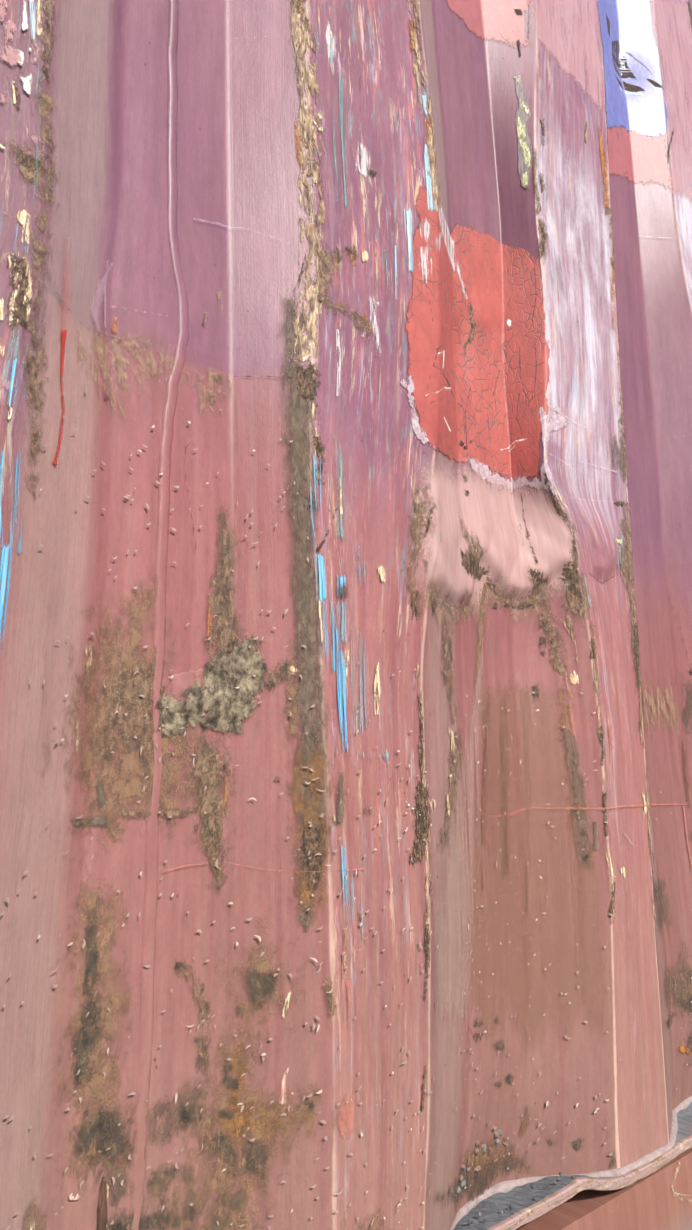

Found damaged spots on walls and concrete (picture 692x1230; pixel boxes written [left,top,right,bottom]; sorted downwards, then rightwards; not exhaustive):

peeling [514,0,531,56]
corrosion [23,0,59,496]
corrosion [290,0,372,362]
peeling [400,374,436,449]
peeling [420,219,442,280]
crack [426,206,545,461]
peeling [460,406,569,500]
corrosion [69,588,231,890]
corrosion [407,473,625,1000]
corrosion [69,889,133,1205]
corrosion [150,962,316,1230]
corrosion [237,949,286,1016]